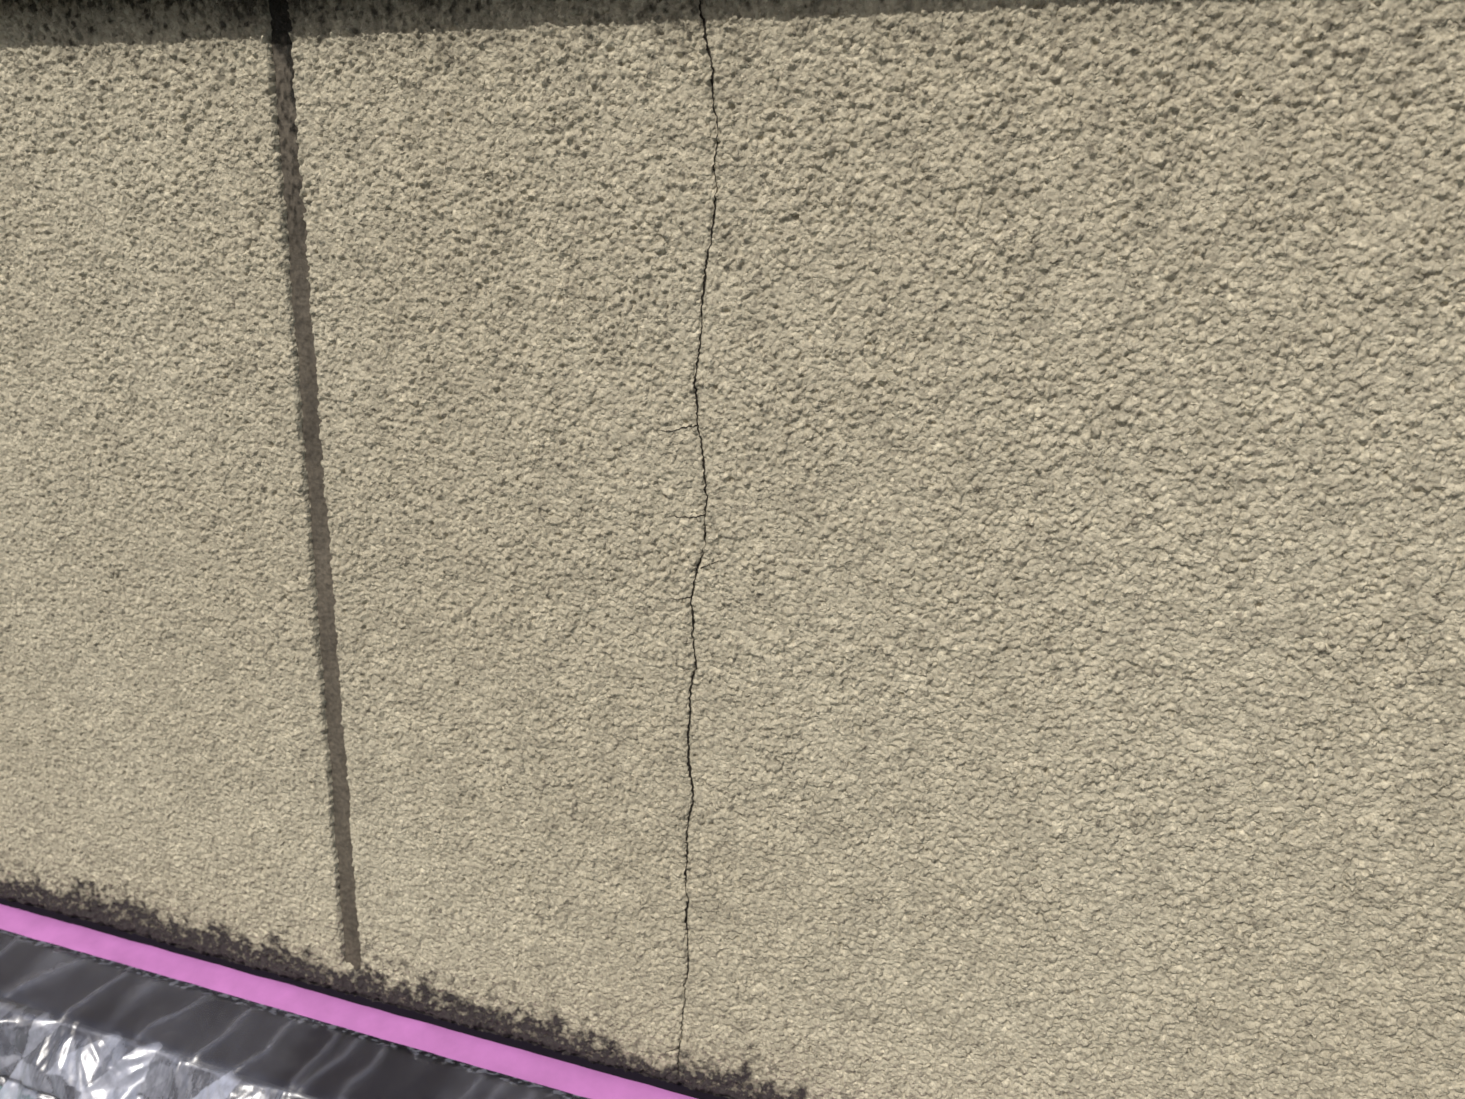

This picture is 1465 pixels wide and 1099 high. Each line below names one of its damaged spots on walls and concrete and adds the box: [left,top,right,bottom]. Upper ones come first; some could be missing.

water stain [0,876,806,1099]
crack [656,0,719,1074]